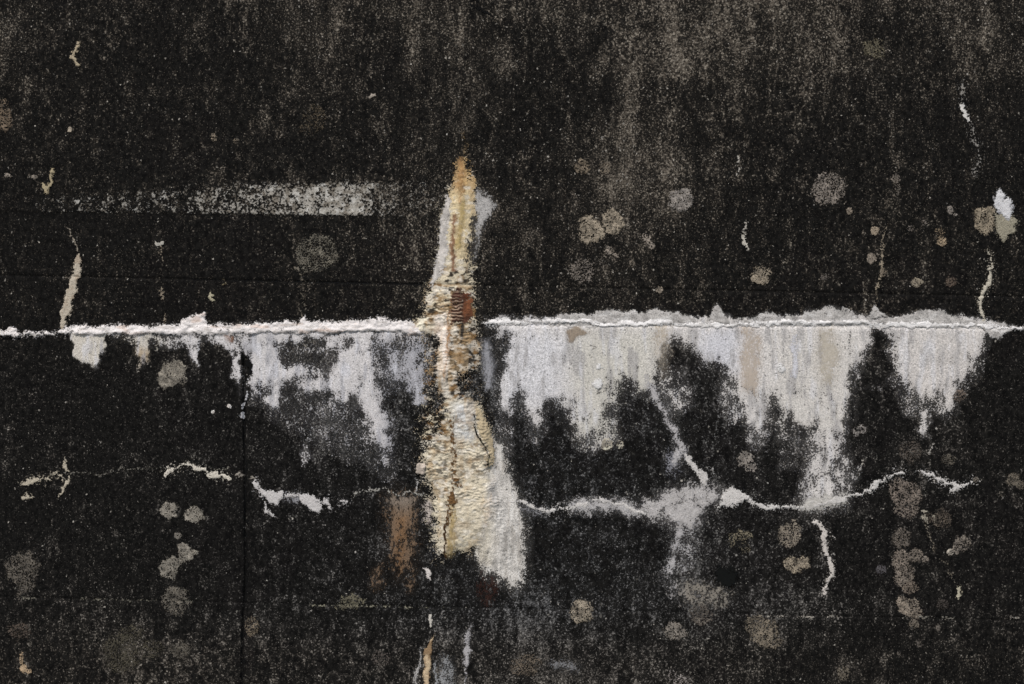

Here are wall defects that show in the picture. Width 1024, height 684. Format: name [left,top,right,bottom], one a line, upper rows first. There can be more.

crack [60,228,82,330]
damp [0,133,1024,589]
crack [978,251,994,321]
crack [18,348,424,684]
crack [508,374,980,620]